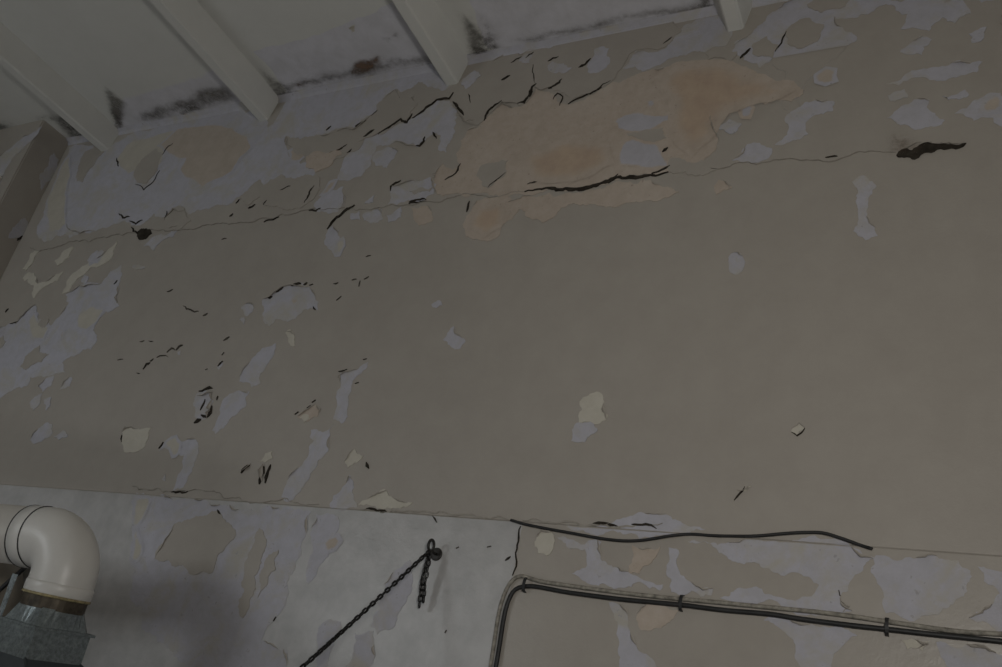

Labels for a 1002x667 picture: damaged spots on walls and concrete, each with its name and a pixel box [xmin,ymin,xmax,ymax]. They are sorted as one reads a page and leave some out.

water stain [250,0,431,95]
water stain [108,66,241,128]
peeling [287,0,982,257]
crack [709,150,896,169]
spalling [119,214,177,251]
crack [31,165,670,252]
peeling [0,241,145,411]
peeling [193,343,276,434]
peeling [129,358,369,667]
peeling [358,489,413,509]
peeling [346,560,413,667]
peeling [535,512,1002,667]